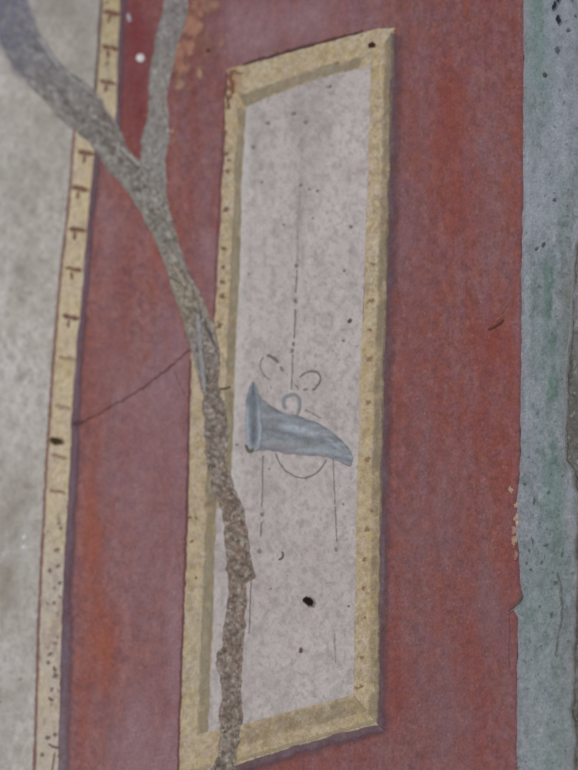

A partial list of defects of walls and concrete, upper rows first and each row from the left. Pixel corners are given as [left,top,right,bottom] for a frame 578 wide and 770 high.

crack [0,0,256,770]